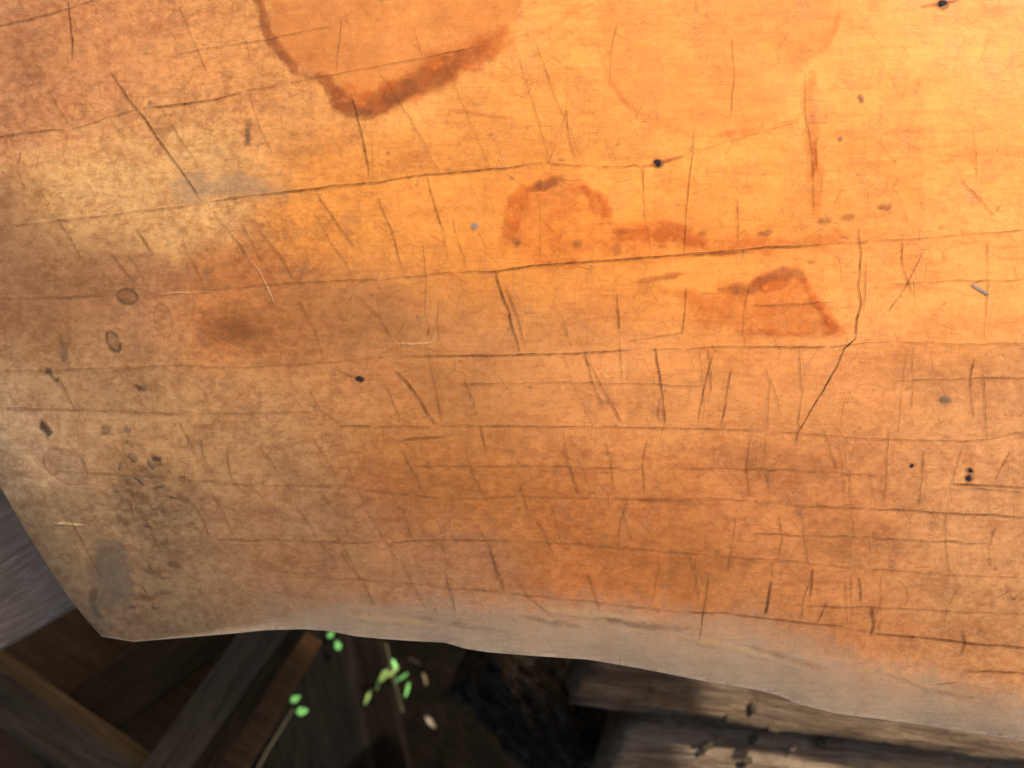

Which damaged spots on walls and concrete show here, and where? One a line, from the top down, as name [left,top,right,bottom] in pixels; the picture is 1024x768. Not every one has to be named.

leakage [256,0,503,118]
leakage [535,178,557,189]
crack [188,230,1024,673]